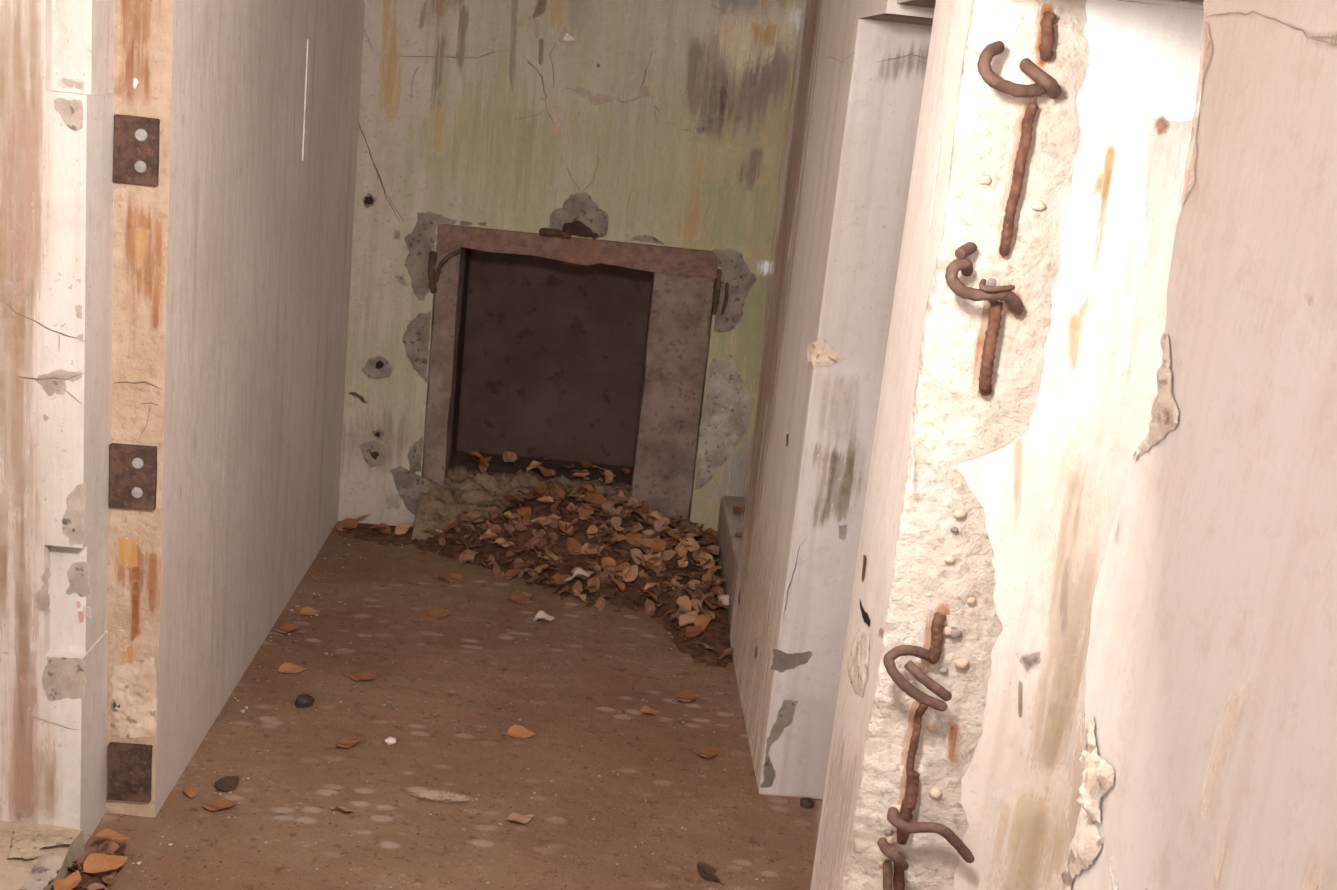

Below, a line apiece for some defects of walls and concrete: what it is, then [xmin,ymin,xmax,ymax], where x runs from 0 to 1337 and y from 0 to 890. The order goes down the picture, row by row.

rust [116,0,151,101]
crack [1205,11,1337,45]
damp [678,34,799,275]
rust [125,202,162,329]
flaking render [394,211,486,382]
rust [973,285,1019,397]
spalling [833,0,1090,890]
rust [117,538,160,664]
flaking render [755,645,812,672]
flaking render [760,700,798,788]
rust [947,722,960,765]
flaking render [1053,715,1114,890]